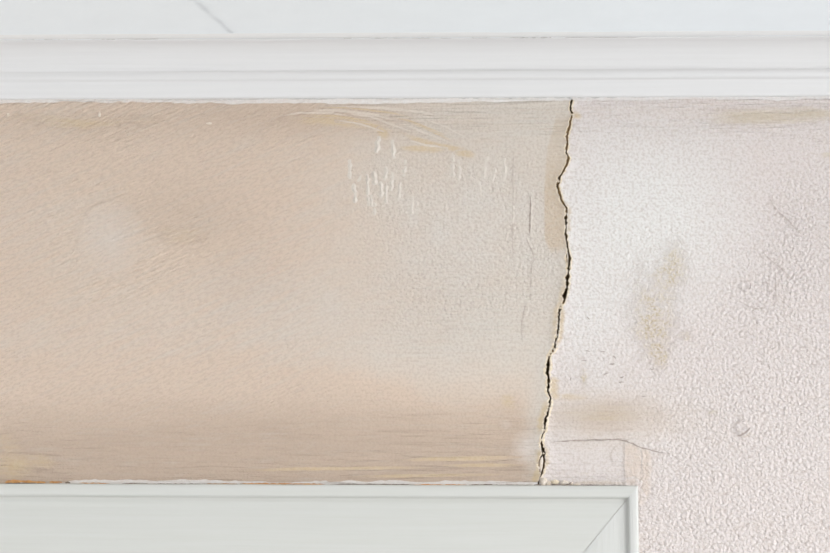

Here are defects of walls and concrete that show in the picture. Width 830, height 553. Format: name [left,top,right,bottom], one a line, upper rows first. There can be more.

crack [305,94,479,102]
crack [509,97,672,484]